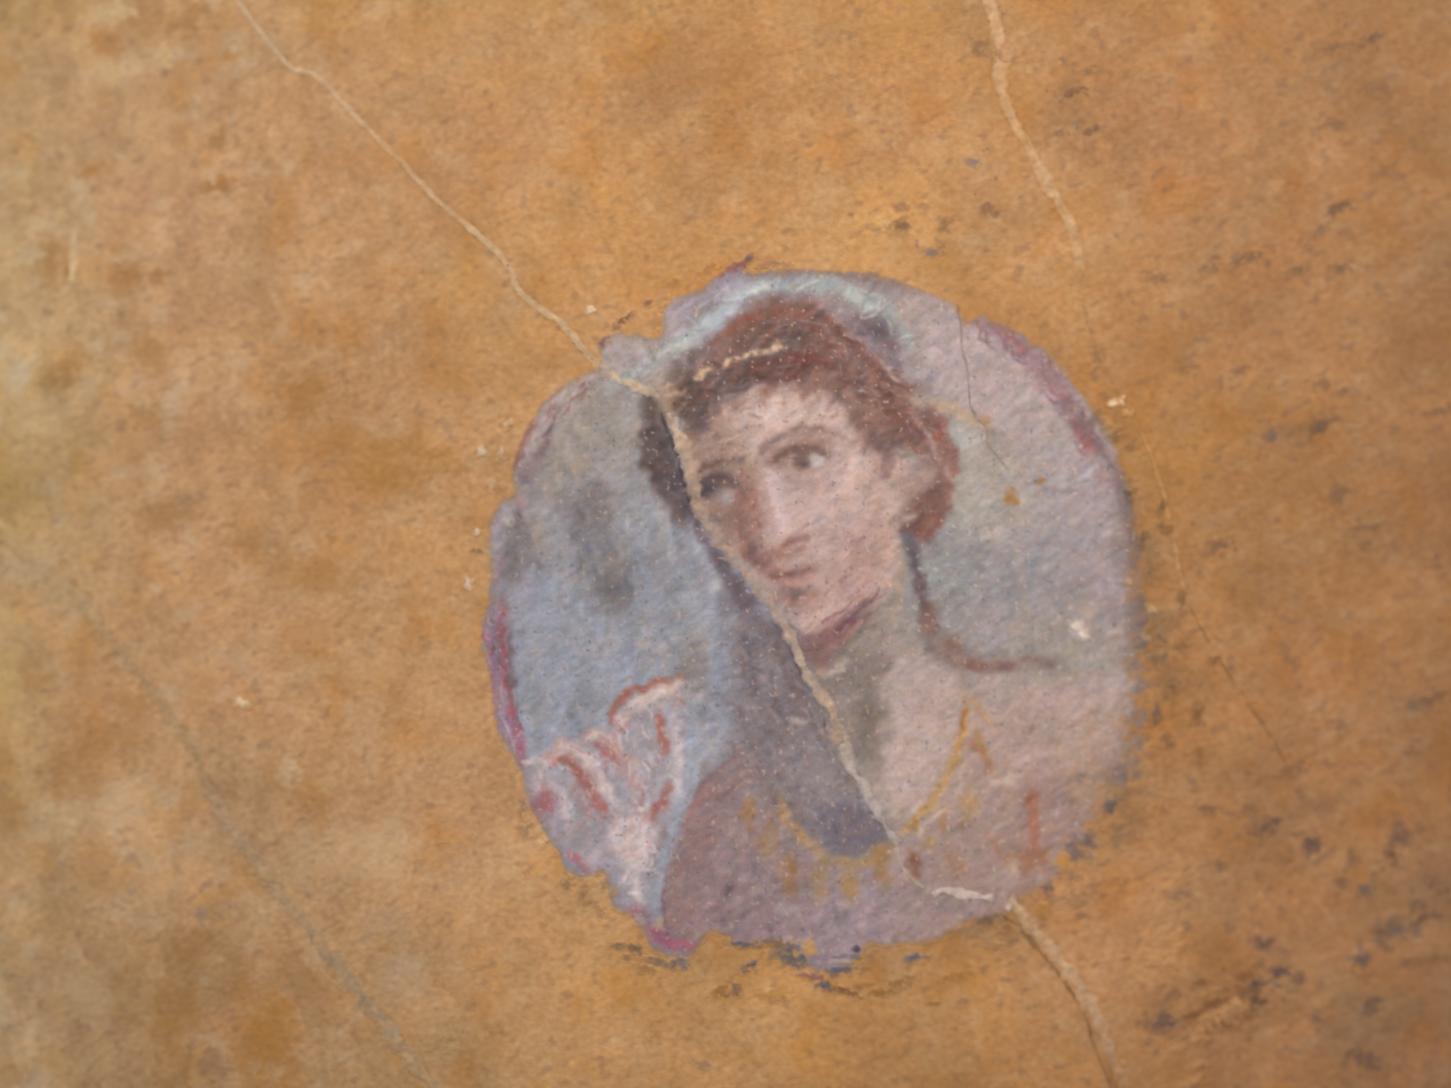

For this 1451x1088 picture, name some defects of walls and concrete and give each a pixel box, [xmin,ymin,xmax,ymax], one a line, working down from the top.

crack [234,0,1134,1088]
crack [965,0,1295,776]